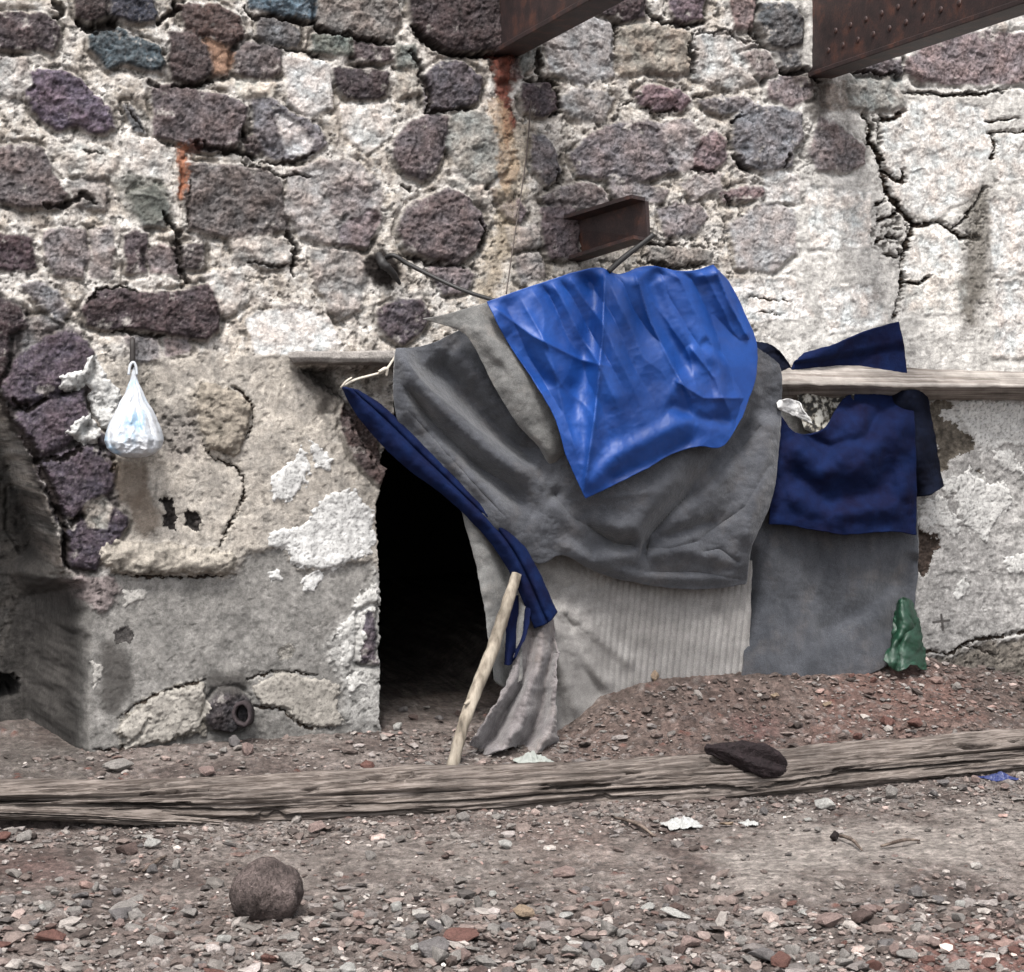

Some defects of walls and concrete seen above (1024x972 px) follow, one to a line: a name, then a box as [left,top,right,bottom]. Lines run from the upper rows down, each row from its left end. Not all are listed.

rust [483,51,516,148]
rust [176,140,202,200]
crack [986,118,1024,160]
crack [860,89,1007,318]
flaking render [158,497,202,532]
crack [205,448,246,546]
peeling [270,440,334,503]
peeling [268,488,377,592]
peeling [917,399,1024,577]
peeling [953,575,971,601]
crack [926,630,1024,657]
crack [120,681,199,719]